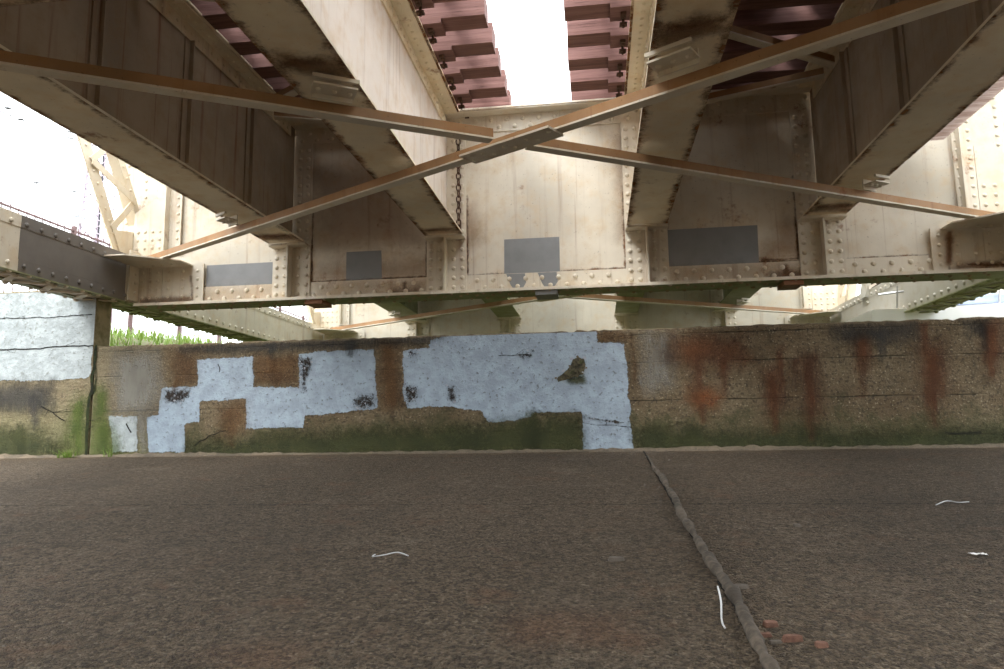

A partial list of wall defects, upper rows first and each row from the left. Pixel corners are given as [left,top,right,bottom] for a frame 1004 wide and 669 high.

corrosion [408,0,459,112]
corrosion [624,5,634,95]
corrosion [645,0,733,88]
corrosion [636,107,647,153]
corrosion [590,167,640,270]
crack [0,312,92,320]
crack [0,341,101,455]
peeling [165,388,192,405]
peeling [299,355,314,394]
peeling [351,389,375,409]
peeling [403,382,418,406]